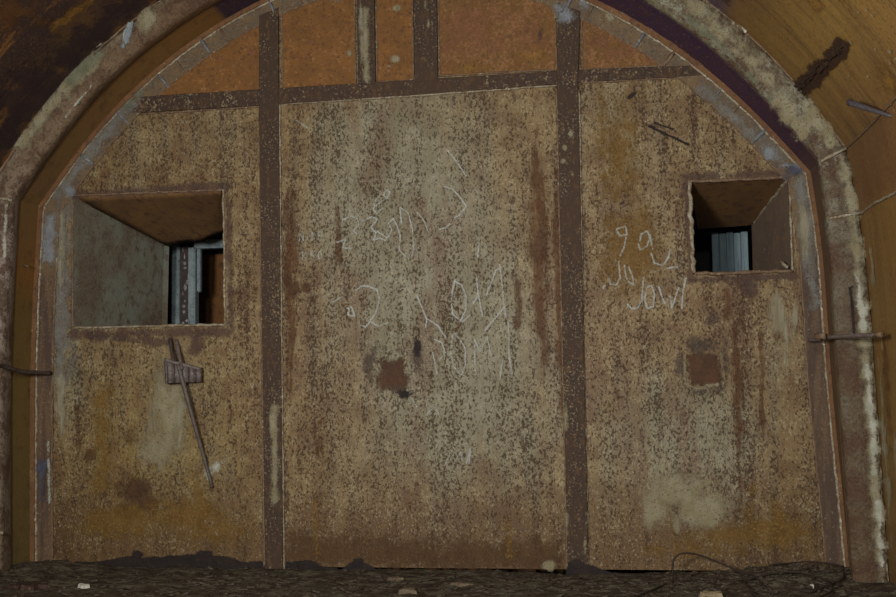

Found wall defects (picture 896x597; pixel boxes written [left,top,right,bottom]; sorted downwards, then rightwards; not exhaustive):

peeling [686,0,851,149]
rust [530,151,562,371]
rust [363,340,421,398]
rust [674,302,742,449]